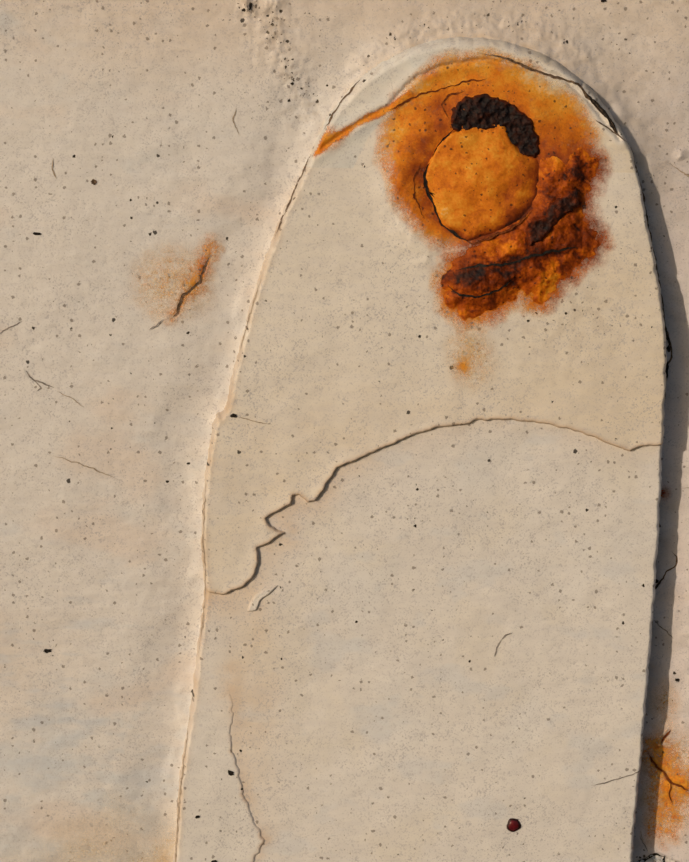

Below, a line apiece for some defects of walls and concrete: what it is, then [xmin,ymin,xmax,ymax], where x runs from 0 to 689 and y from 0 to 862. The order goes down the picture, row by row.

rust [314,50,611,373]
rust [155,242,217,304]
peeling [201,37,671,595]
peeling [247,585,278,612]
peeling [173,693,265,862]
rust [644,738,689,835]
spalling [637,853,676,862]